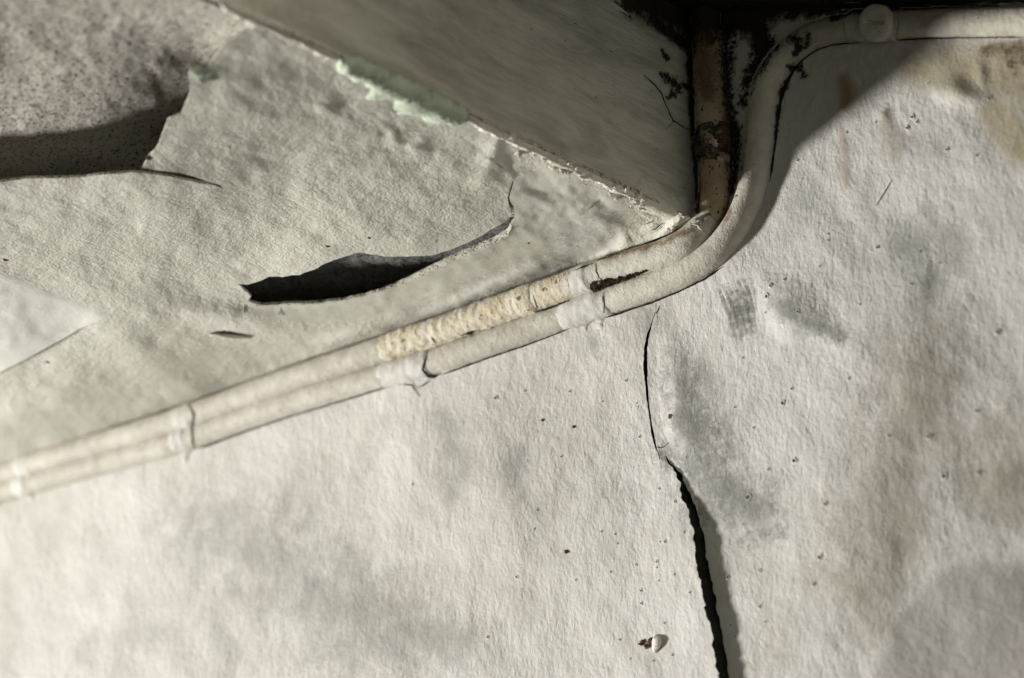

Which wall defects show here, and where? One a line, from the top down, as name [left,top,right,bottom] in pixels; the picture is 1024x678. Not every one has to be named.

peeling [0,0,709,464]
leakage [616,0,866,213]
crack [643,308,729,678]